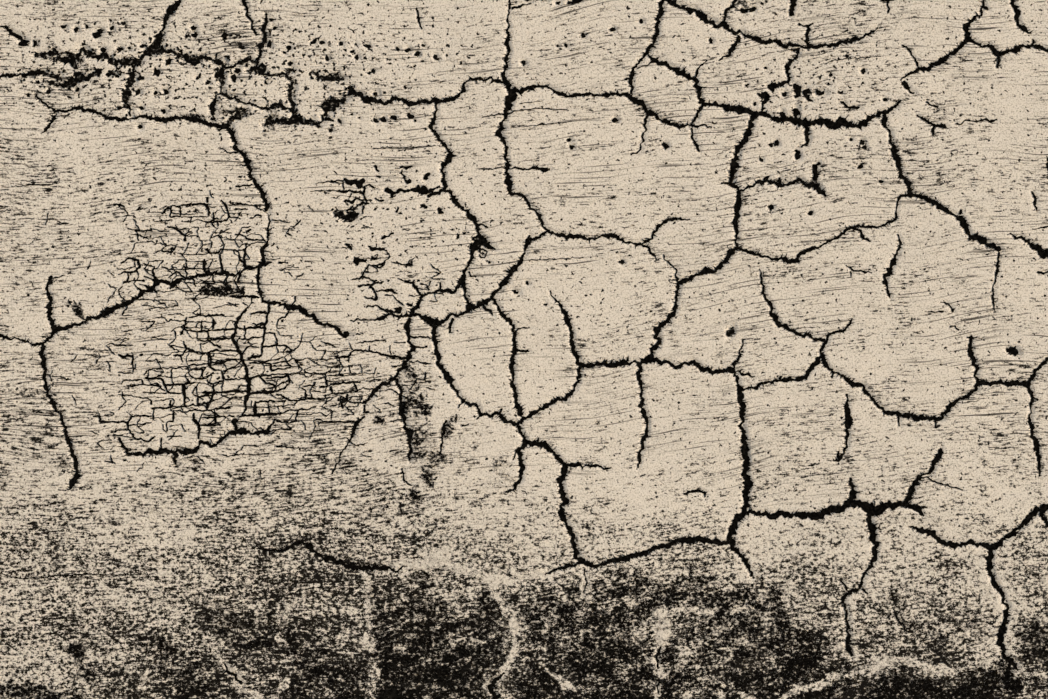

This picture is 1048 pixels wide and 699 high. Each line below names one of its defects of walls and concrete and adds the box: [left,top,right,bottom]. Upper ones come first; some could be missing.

crack [0,25,31,46]
crack [153,0,182,49]
crack [241,0,270,68]
crack [900,0,1048,94]
crack [0,70,45,80]
crack [917,101,997,136]
crack [35,94,271,219]
crack [347,0,902,323]
crack [0,113,1048,657]
crack [223,663,244,685]
crack [652,646,662,693]